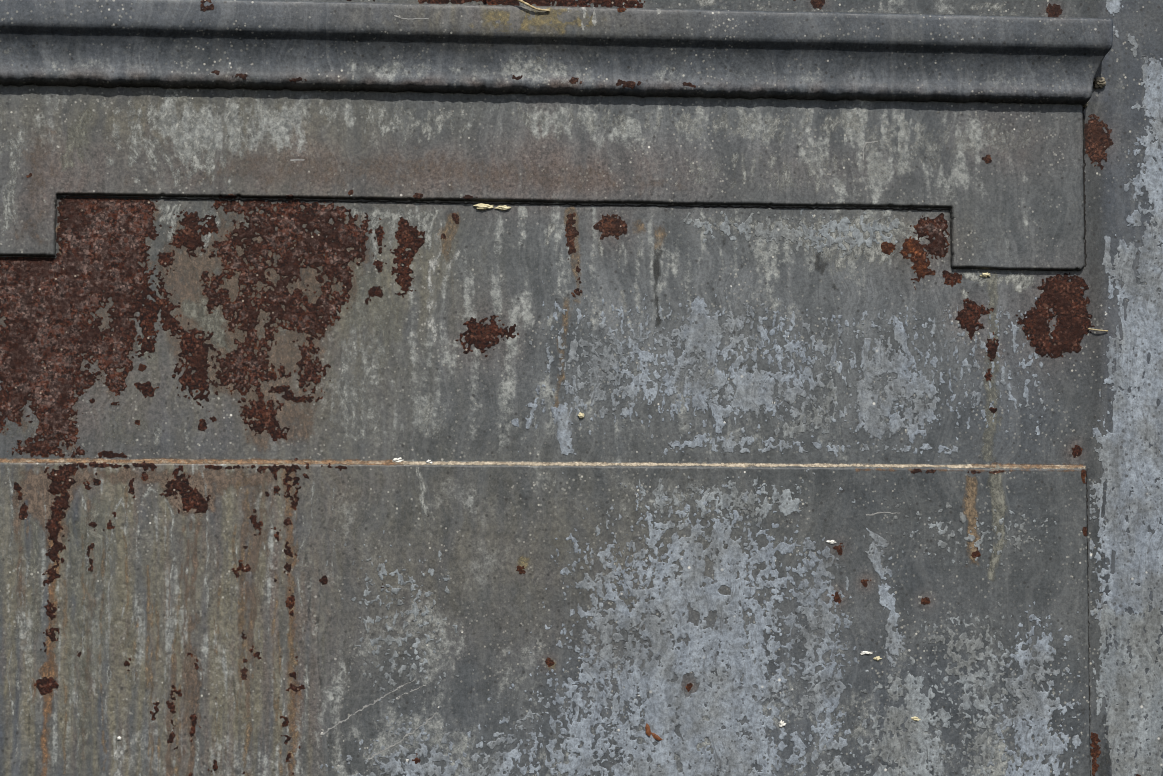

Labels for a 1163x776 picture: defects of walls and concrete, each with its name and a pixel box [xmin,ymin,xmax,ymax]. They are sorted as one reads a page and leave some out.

rust [418,0,645,12]
rust [1084,114,1114,170]
rust [441,213,459,252]
rust [593,214,664,247]
rust [456,315,519,357]
rust [557,206,583,354]
rust [881,213,999,381]
rust [1016,272,1095,358]
rust [0,190,425,776]
rust [1090,732,1101,776]